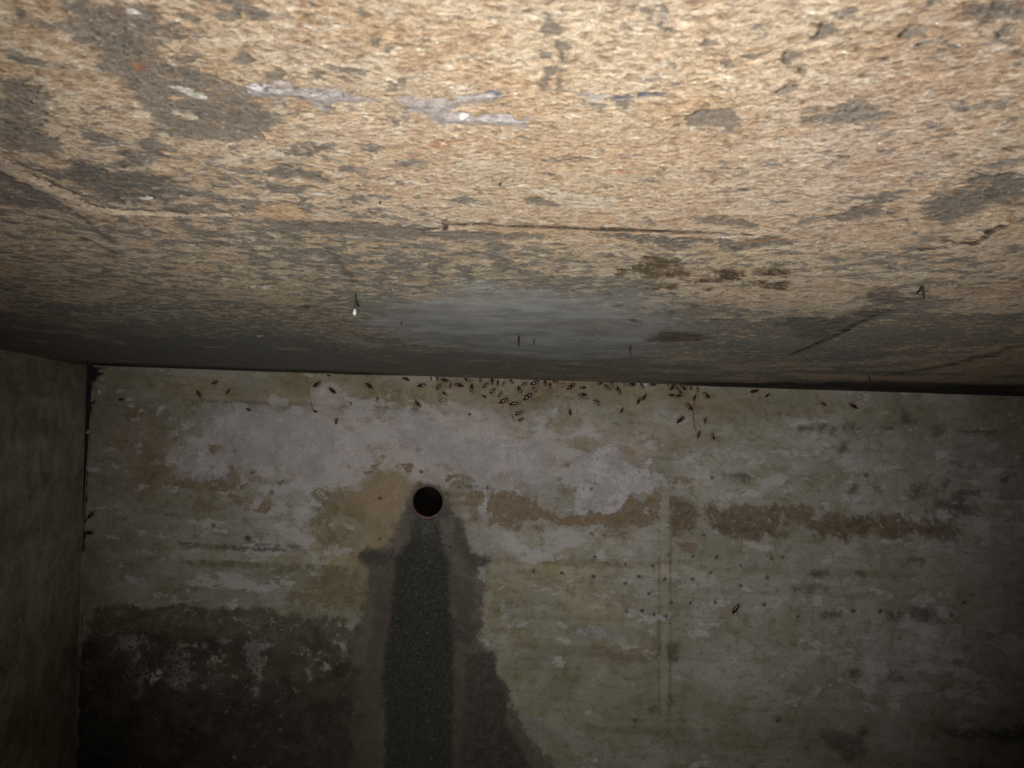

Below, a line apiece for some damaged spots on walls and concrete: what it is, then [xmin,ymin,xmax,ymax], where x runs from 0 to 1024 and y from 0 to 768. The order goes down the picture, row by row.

crack [422,219,780,242]
crack [790,310,891,356]
water stain [77,463,969,768]